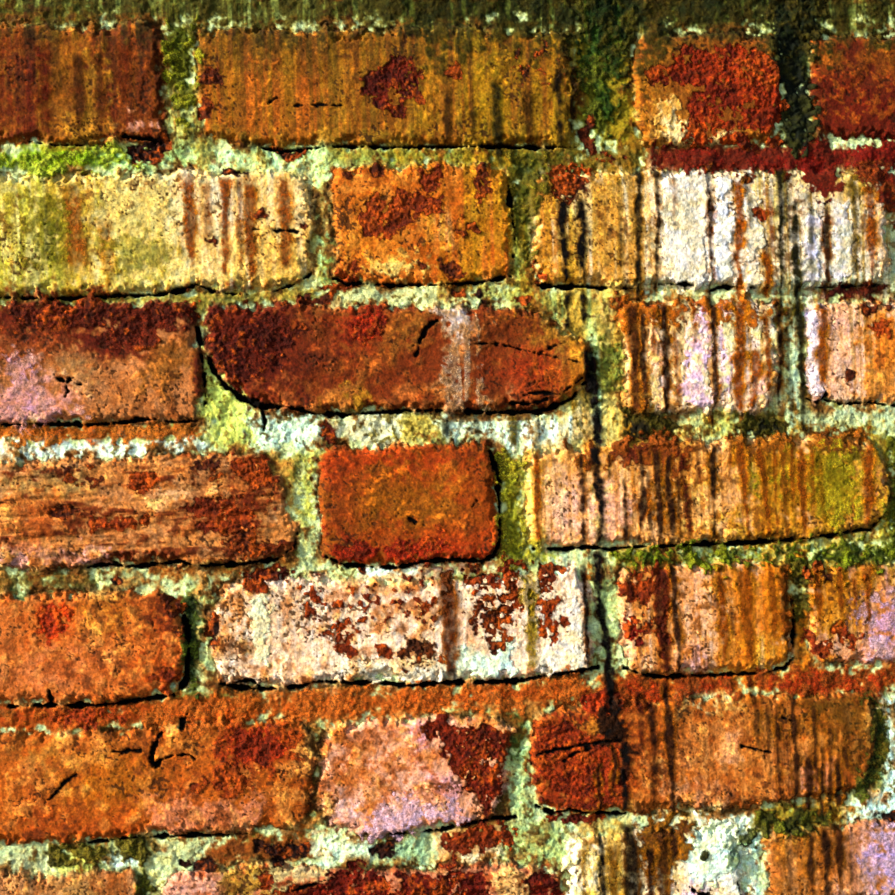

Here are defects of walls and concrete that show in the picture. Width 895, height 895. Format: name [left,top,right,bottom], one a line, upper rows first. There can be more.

corrosion [180,178,258,277]
corrosion [276,178,294,267]
corrosion [609,290,789,332]
crack [1,326,590,431]
corrosion [603,427,694,483]
leakage [622,445,718,543]
leakage [437,571,459,677]
leakage [578,349,678,811]
crack [8,613,196,769]
crack [530,739,621,765]
crack [88,831,248,844]
leakage [597,824,680,895]